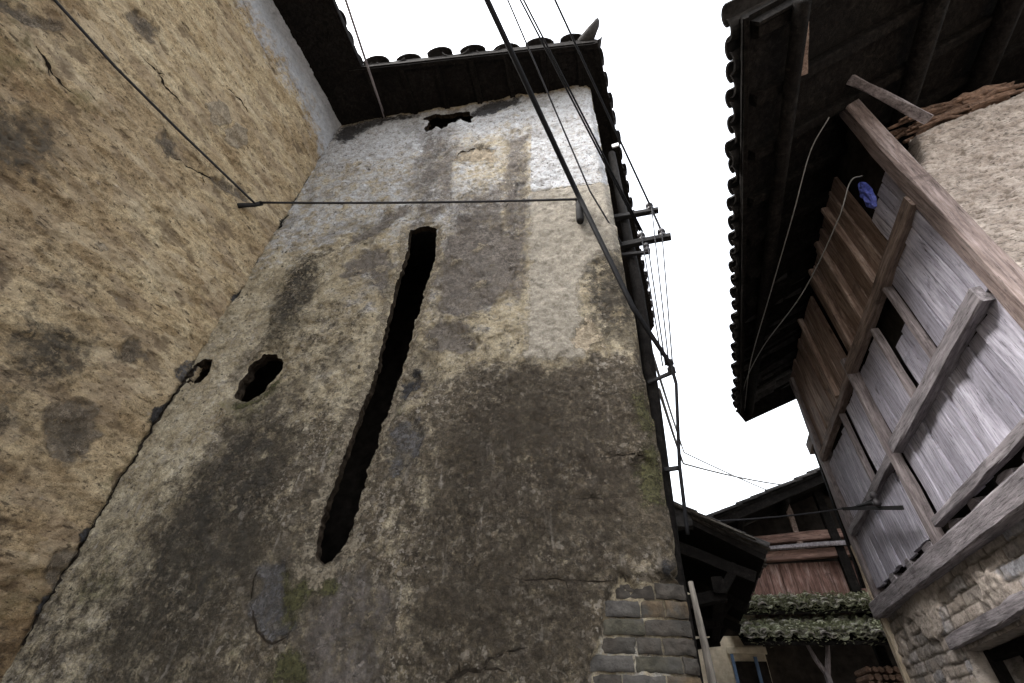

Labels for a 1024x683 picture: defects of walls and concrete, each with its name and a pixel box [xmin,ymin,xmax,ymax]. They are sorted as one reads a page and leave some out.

crack [36,46,77,96]
crack [143,58,181,104]
damp [415,127,530,300]
damp [83,404,296,683]
crack [293,225,443,596]
damp [419,356,637,683]